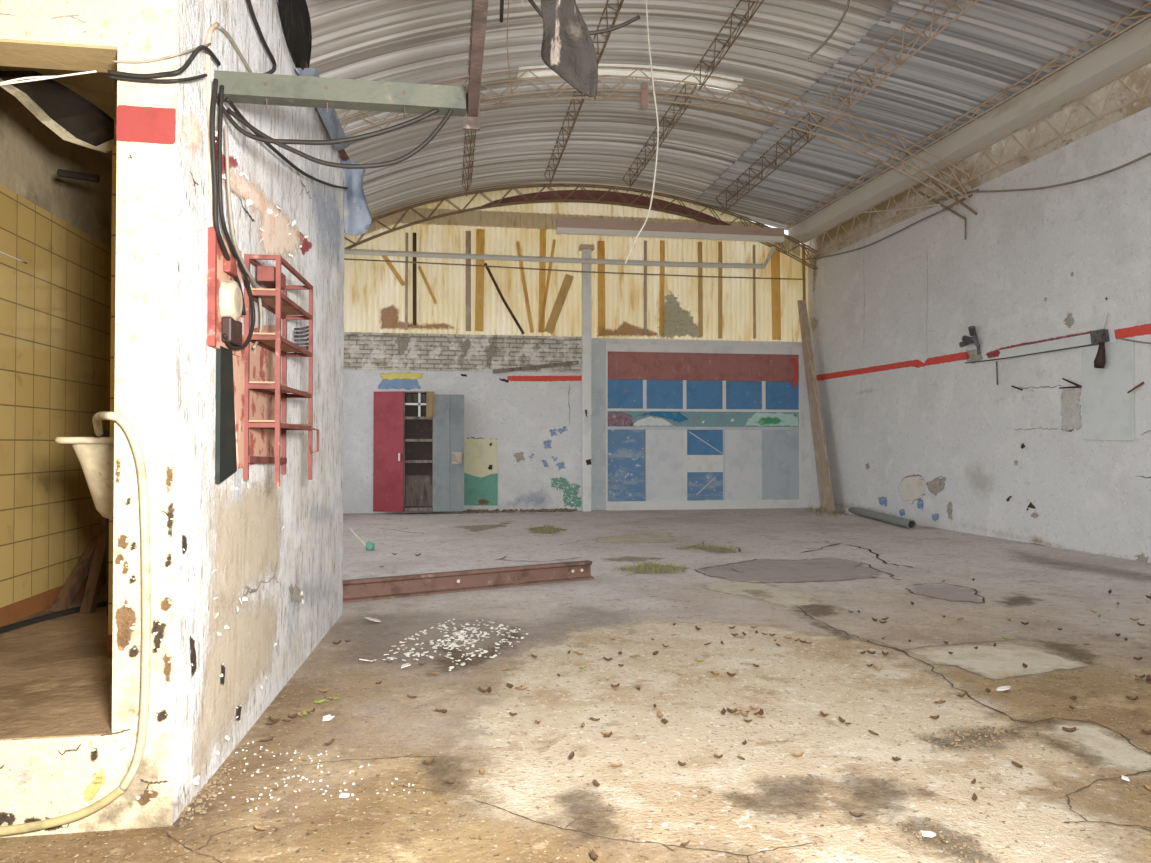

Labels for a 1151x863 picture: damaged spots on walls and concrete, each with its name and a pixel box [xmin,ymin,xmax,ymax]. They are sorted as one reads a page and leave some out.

peeling [182,113,312,261]
flaking render [1061,388,1081,431]
flaking render [165,466,189,567]
flaking render [878,478,953,522]
flaking render [114,535,137,583]
flaking render [289,584,304,605]
flaking render [116,597,173,682]
peeling [190,481,284,785]
crack [689,541,1151,832]
flaking render [0,812,68,832]
peeling [79,748,105,802]
flaking render [136,790,158,806]